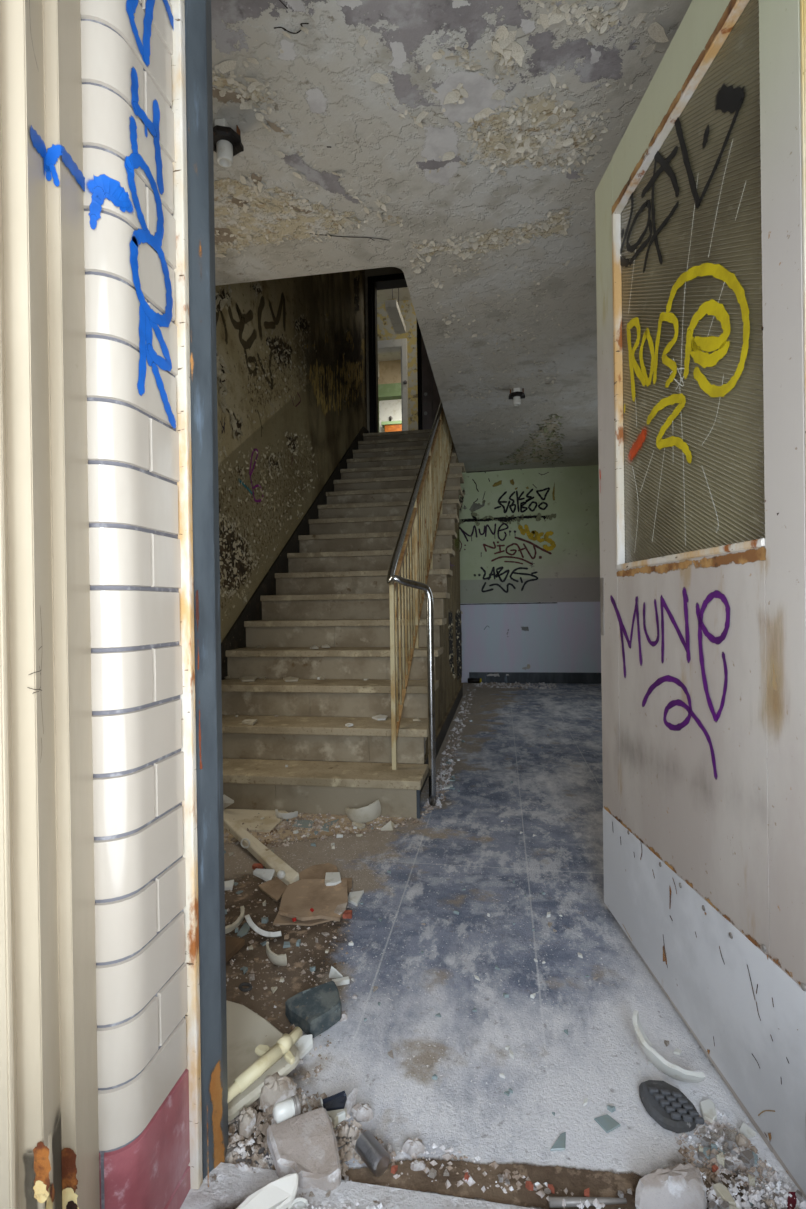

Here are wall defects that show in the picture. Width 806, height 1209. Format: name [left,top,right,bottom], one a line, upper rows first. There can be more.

peeling [211,0,669,258]
peeling [410,200,574,273]
rust [33,1141,78,1209]
rust [207,1060,225,1187]